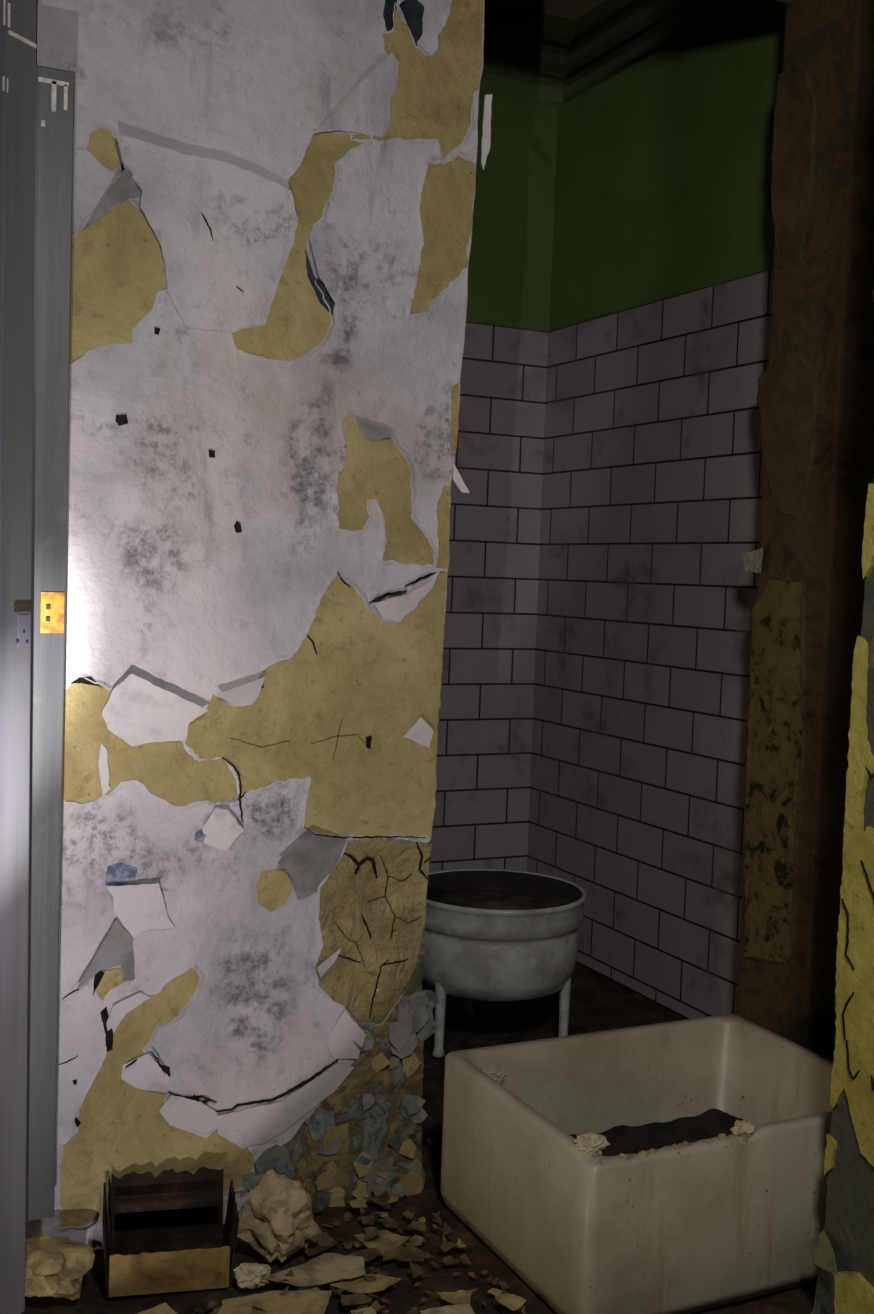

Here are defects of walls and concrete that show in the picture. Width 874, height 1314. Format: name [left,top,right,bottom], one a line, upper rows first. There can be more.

peeling [70,0,492,372]
peeling [862,483,874,579]
peeling [54,382,469,1232]
crack [305,828,432,1018]
peeling [830,636,874,1166]
crack [841,860,874,1091]
peeling [824,1133,837,1176]
peeling [806,1230,874,1314]